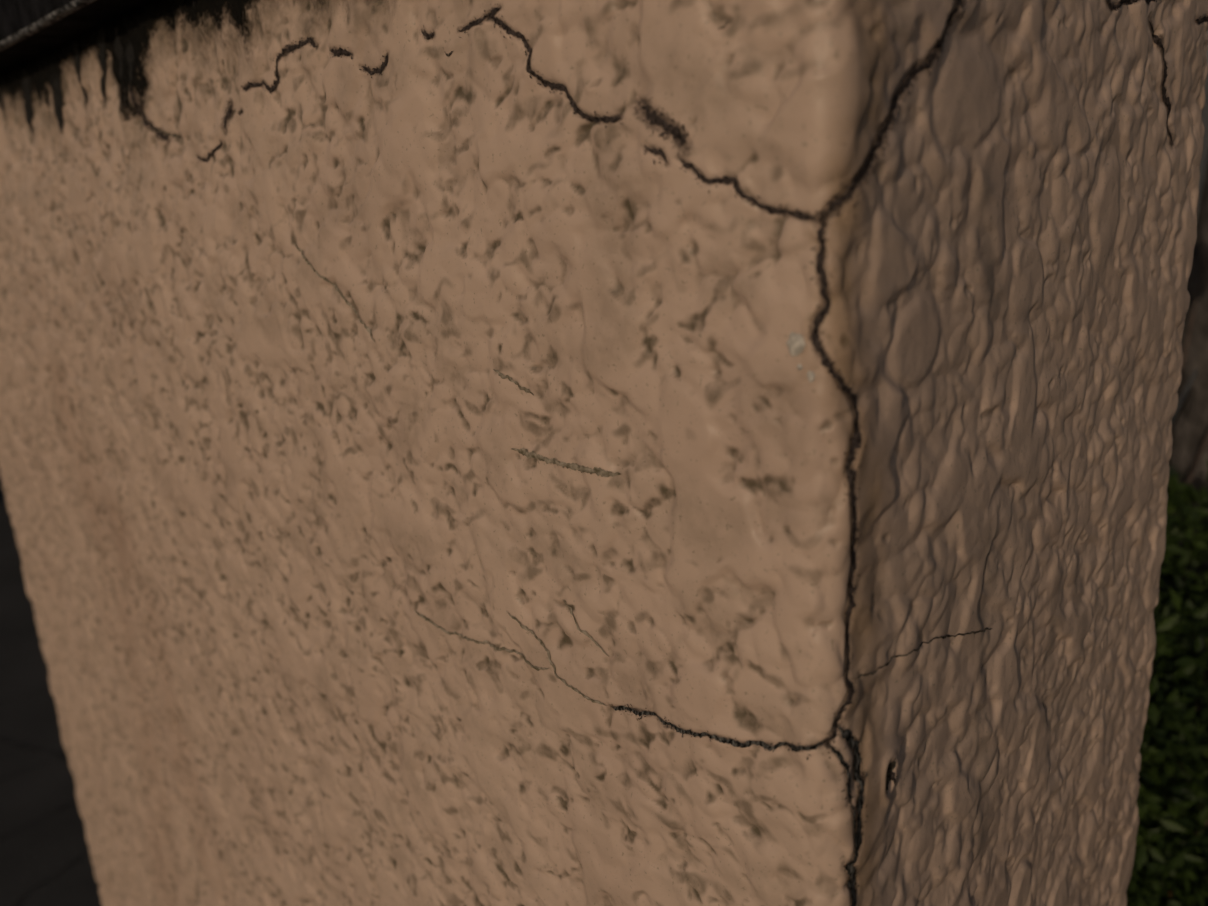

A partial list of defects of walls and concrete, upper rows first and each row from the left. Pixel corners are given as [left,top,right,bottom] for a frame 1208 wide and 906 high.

leakage [0,0,258,135]
crack [128,37,388,162]
crack [1106,0,1173,146]
crack [1196,13,1208,25]
crack [294,243,375,342]
crack [415,0,991,906]